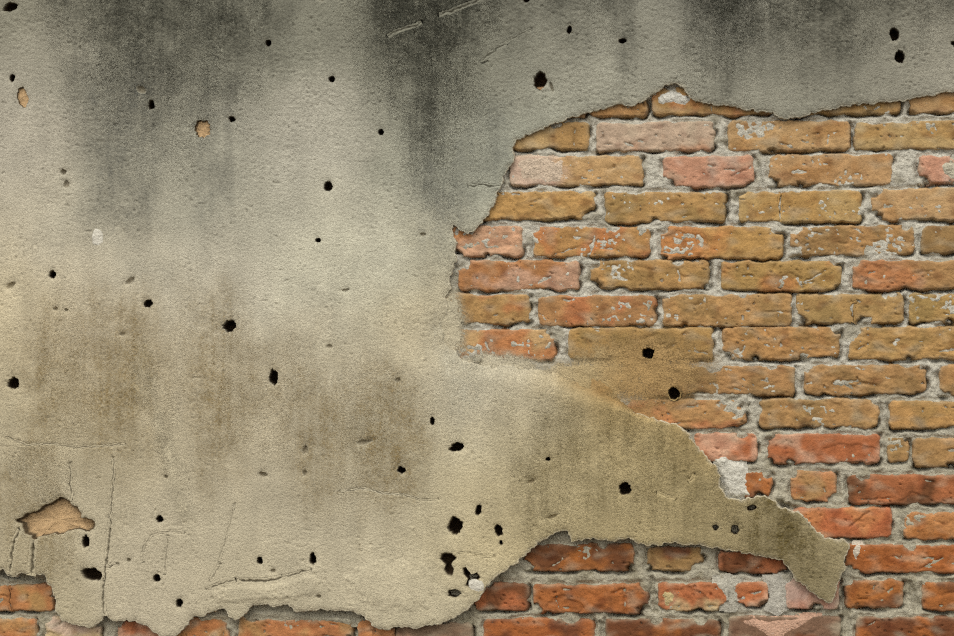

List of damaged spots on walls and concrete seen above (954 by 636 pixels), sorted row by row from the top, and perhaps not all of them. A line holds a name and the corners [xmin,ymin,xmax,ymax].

damp [374,0,477,74]
peeling [91,228,103,245]
flaking render [174,82,954,636]
flaking render [14,497,96,540]
crack [2,434,126,616]
flaking render [0,568,159,636]